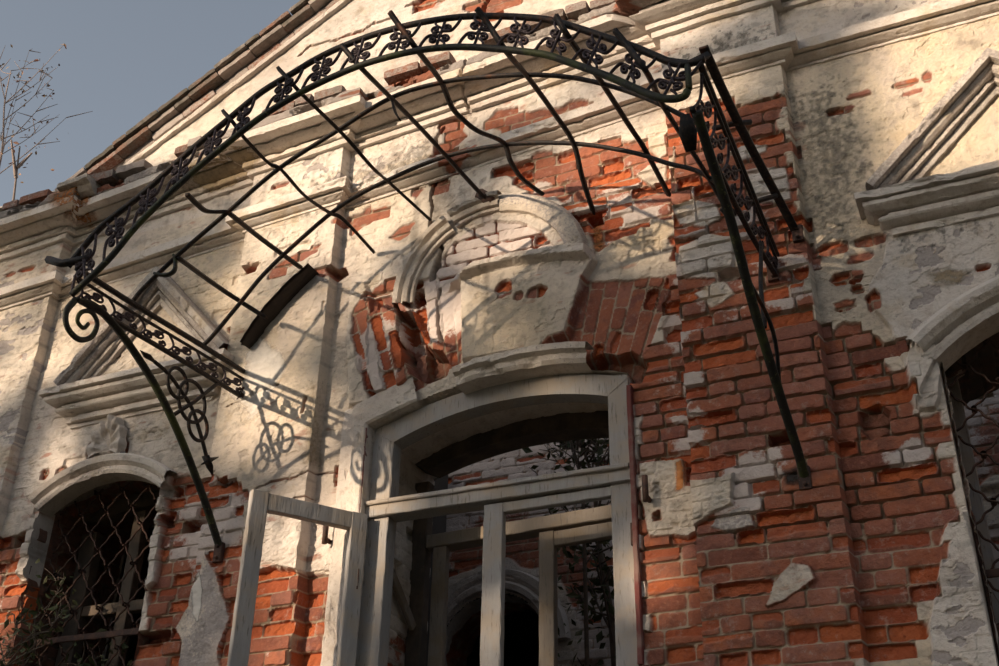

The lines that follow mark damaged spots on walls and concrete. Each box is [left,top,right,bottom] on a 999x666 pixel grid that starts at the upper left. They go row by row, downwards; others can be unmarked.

spalling [221,0,665,140]
spalling [0,189,81,219]
spalling [93,149,203,197]
spalling [331,205,391,236]
spalling [350,220,554,397]
spalling [484,83,999,666]
spalling [0,507,55,666]
spalling [133,470,249,666]
spalling [248,513,334,666]